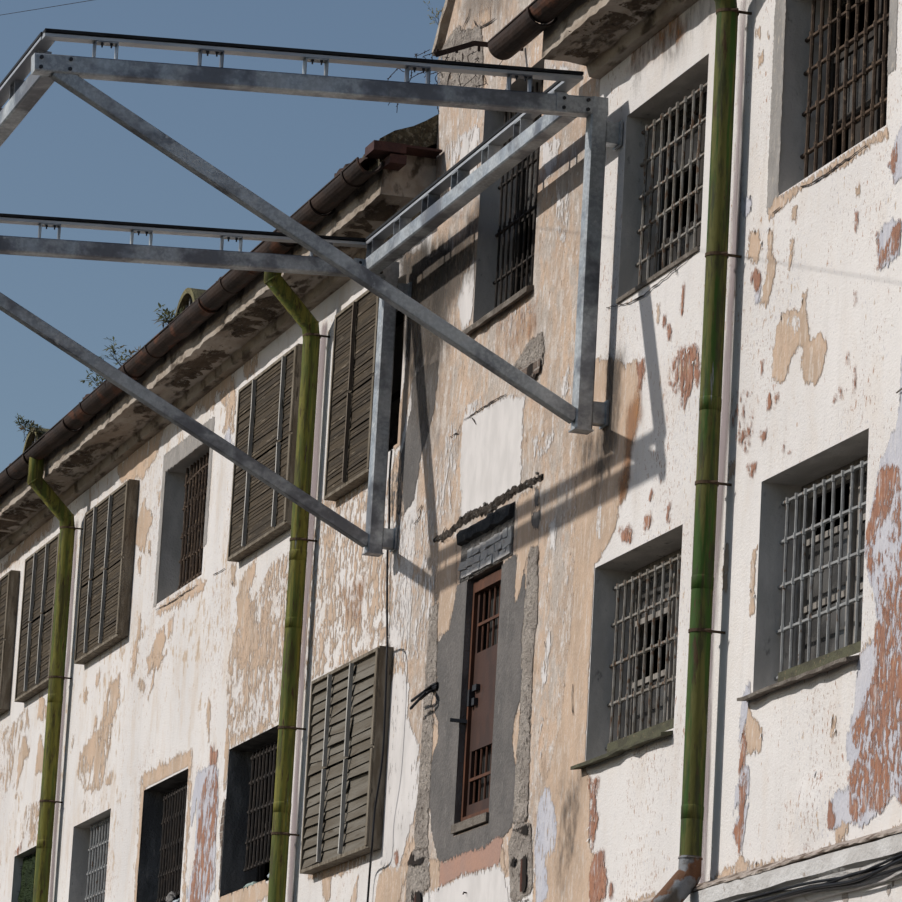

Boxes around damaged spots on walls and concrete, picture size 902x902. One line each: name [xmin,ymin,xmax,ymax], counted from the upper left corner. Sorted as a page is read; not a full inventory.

water stain [403,316,445,428]
water stain [401,202,479,319]
peeling [457,260,474,330]
water stain [583,357,622,482]
peeling [760,287,827,410]
peeling [747,125,902,309]
peeling [71,577,207,813]
peeling [135,491,160,574]
peeling [134,553,289,902]
peeling [299,318,645,902]
peeling [710,681,786,880]
peeling [821,356,902,848]